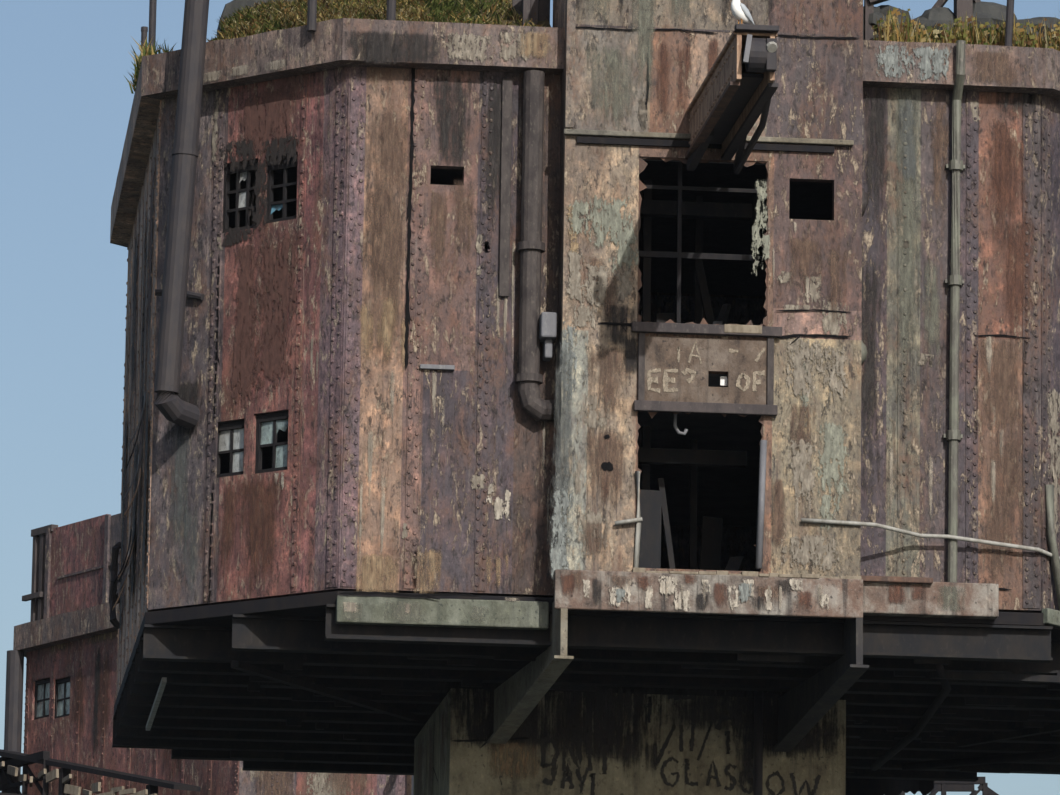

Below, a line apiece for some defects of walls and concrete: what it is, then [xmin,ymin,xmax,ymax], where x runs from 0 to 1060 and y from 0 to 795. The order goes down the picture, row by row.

peeling [468,474,511,520]
water stain [445,682,837,787]